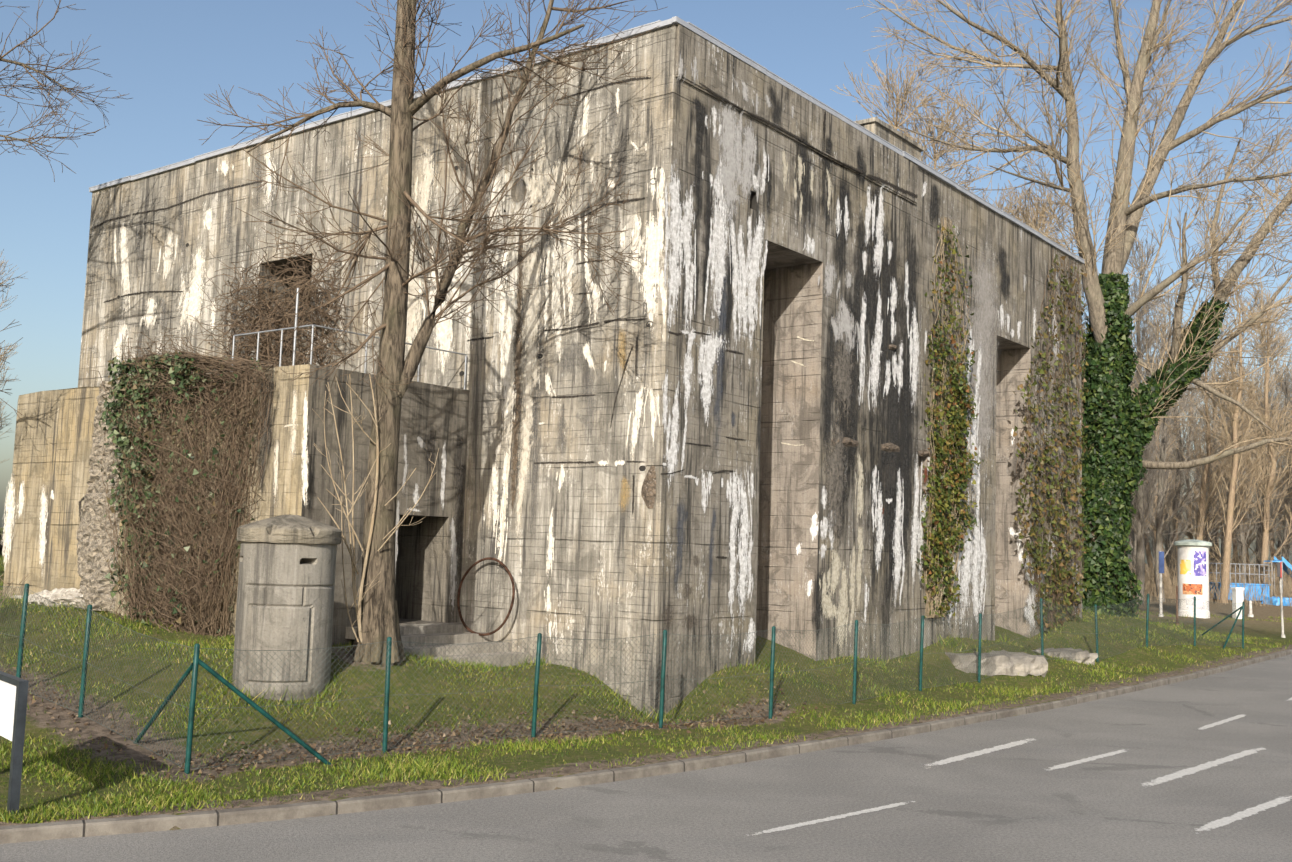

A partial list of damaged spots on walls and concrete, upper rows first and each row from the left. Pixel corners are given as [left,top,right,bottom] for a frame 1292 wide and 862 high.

damp [676,54,698,84]
damp [203,148,276,252]
damp [921,182,940,222]
damp [114,186,216,363]
damp [598,79,930,655]
spalling [881,442,900,452]